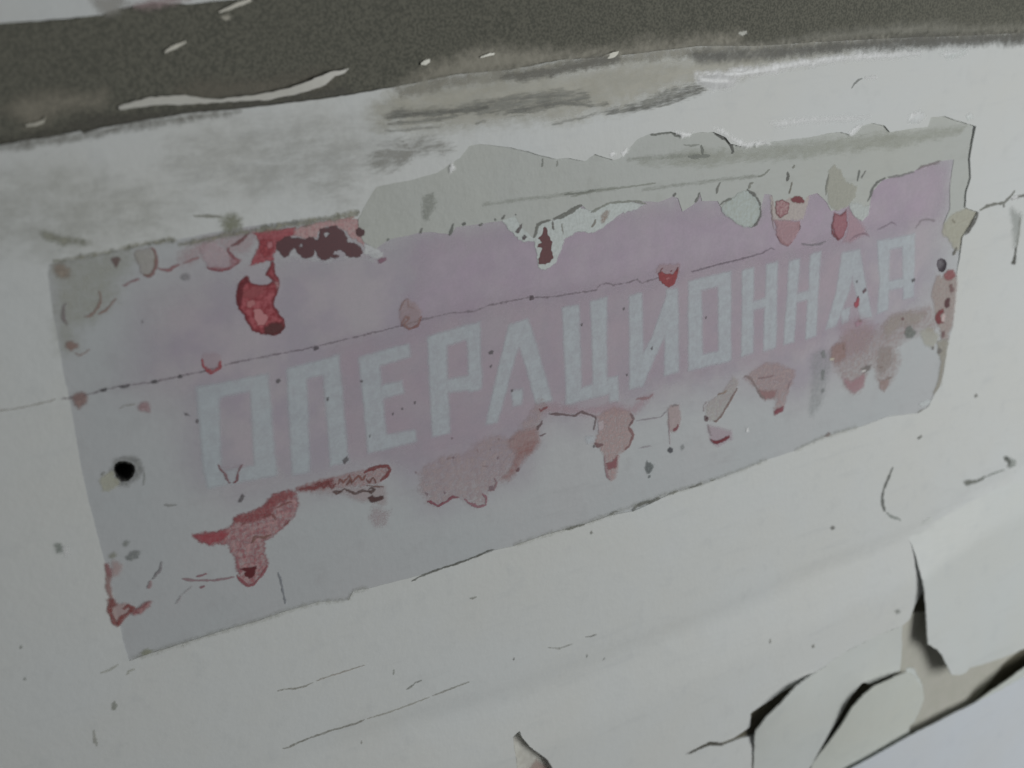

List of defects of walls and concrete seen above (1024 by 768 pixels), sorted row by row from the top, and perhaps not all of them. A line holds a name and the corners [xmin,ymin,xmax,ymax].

flaking render [0,0,1024,147]
peeling [236,116,979,336]
peeling [421,394,684,508]
peeling [703,364,794,444]
crack [881,467,900,520]
peeling [753,479,1024,768]